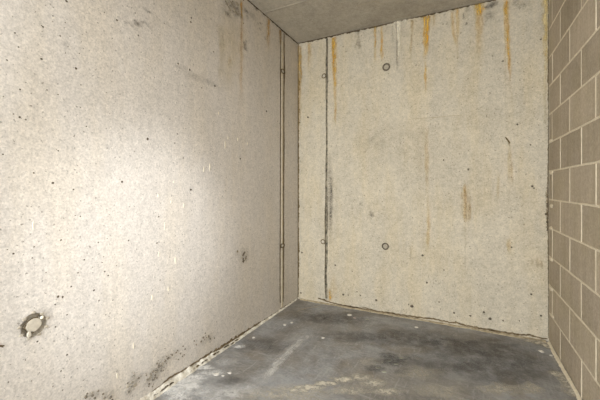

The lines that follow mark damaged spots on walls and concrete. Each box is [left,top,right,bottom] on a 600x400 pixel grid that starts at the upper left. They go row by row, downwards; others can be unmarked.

damp [164,365,254,400]
damp [263,374,400,397]